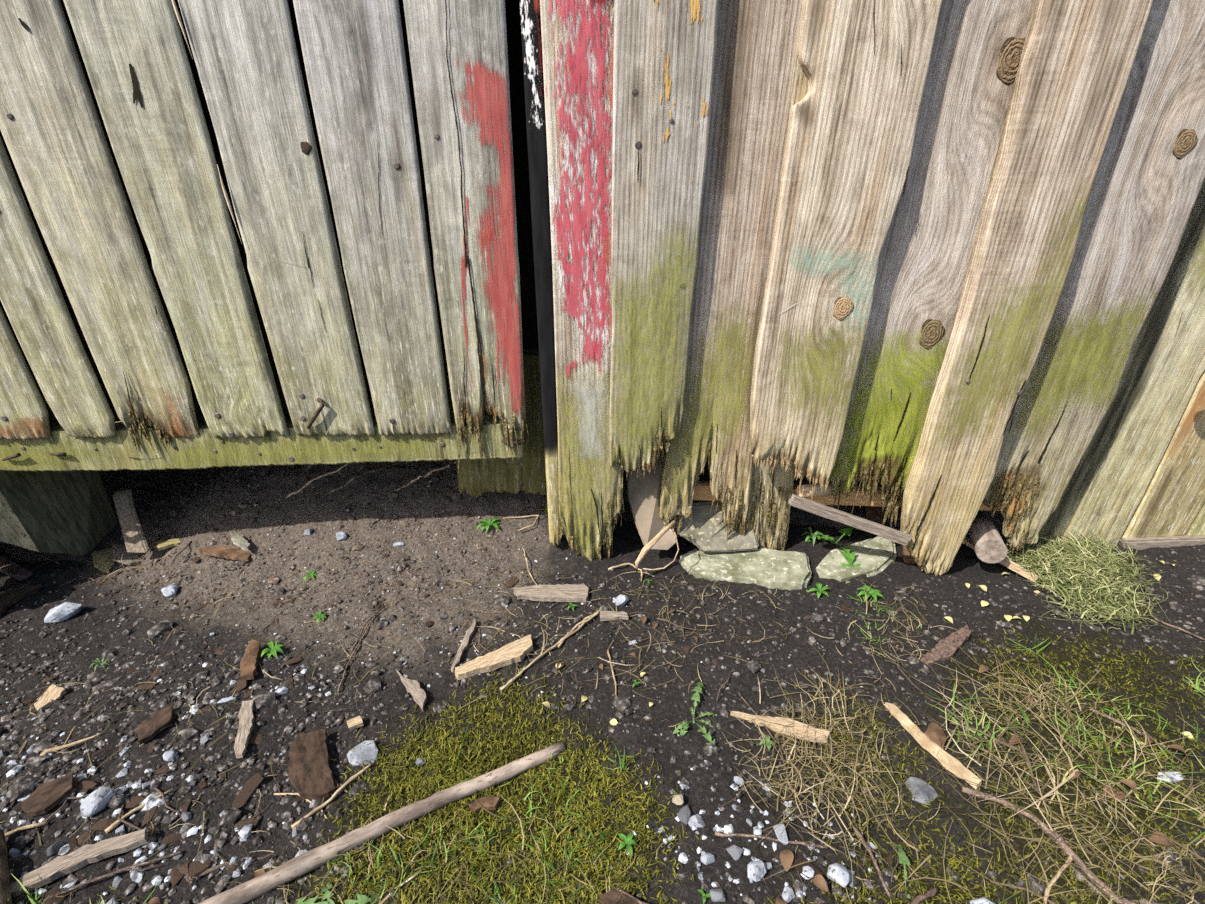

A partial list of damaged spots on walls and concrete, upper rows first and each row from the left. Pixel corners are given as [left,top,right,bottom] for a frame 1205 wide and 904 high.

peeling [456,59,523,415]
peeling [520,0,614,453]
crack [969,315,990,380]
crack [1003,380,1068,466]